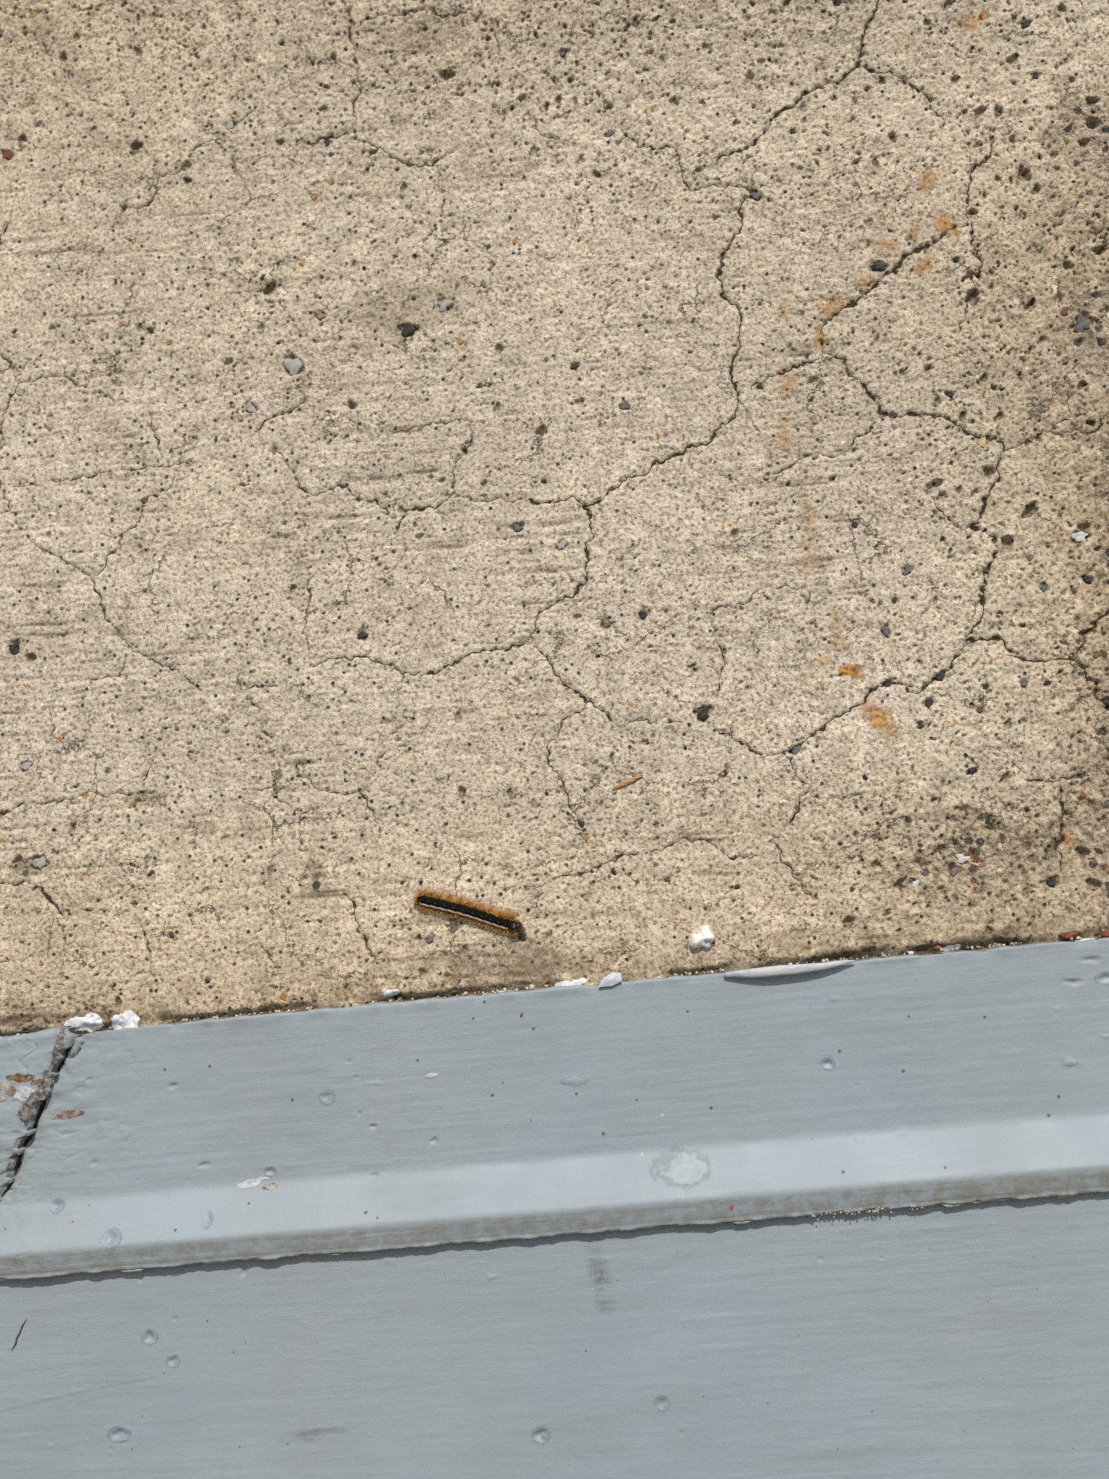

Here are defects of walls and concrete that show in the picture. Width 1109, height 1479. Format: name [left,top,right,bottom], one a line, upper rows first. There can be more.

crack [85,139,221,247]
crack [244,0,1109,901]
crack [0,354,202,751]
crack [4,747,157,815]
crack [0,881,157,985]
crack [343,892,376,959]
peeling [0,1026,71,1127]
crack [5,1031,83,1193]
peeling [51,1110,85,1120]